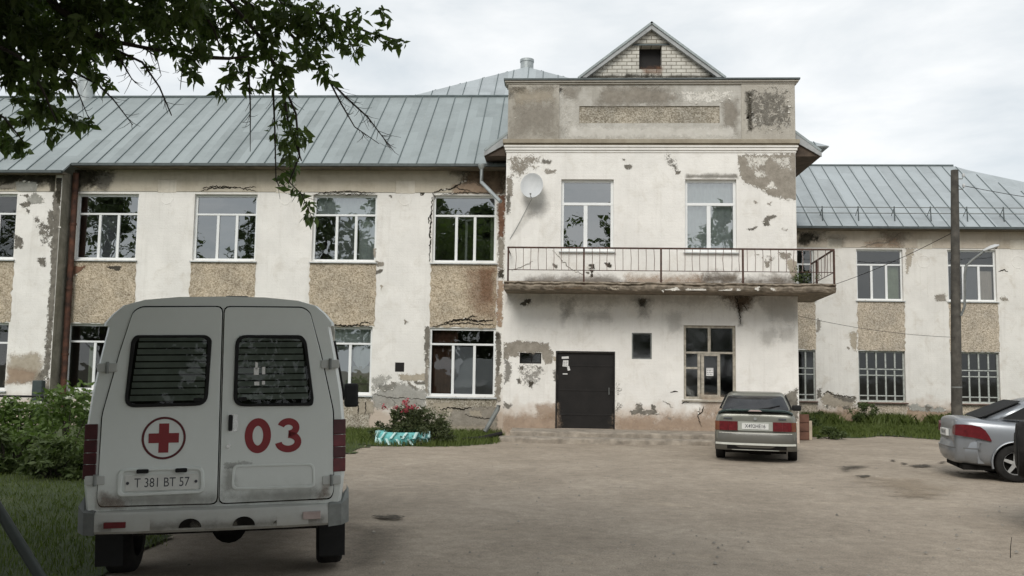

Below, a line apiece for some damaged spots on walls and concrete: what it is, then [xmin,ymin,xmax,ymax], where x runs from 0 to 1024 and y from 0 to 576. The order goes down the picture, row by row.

peeling [666,87,791,133]
crack [202,184,255,192]
flaking render [737,153,796,231]
crack [428,180,489,261]
peeling [0,178,62,396]
peeling [352,152,558,431]
damp [723,296,754,310]
crack [435,315,493,327]
damp [7,352,42,383]
flaking render [615,386,671,419]
flaking render [817,389,860,412]